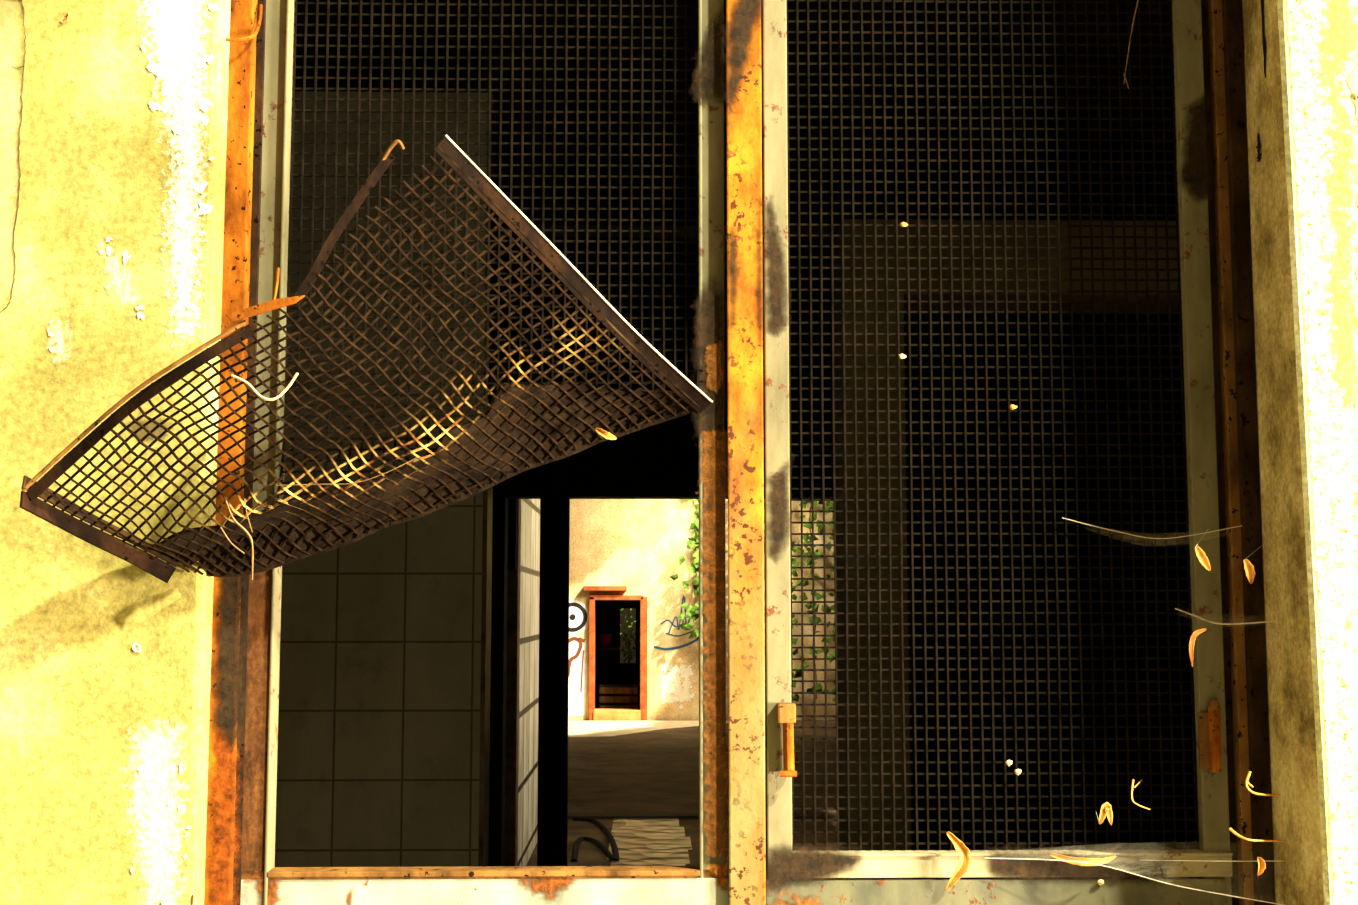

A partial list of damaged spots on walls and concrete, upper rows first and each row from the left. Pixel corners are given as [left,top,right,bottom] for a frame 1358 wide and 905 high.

crack [0,0,26,313]
flaking render [136,0,220,347]
flaking render [123,720,194,905]
corrosion [209,732,241,905]